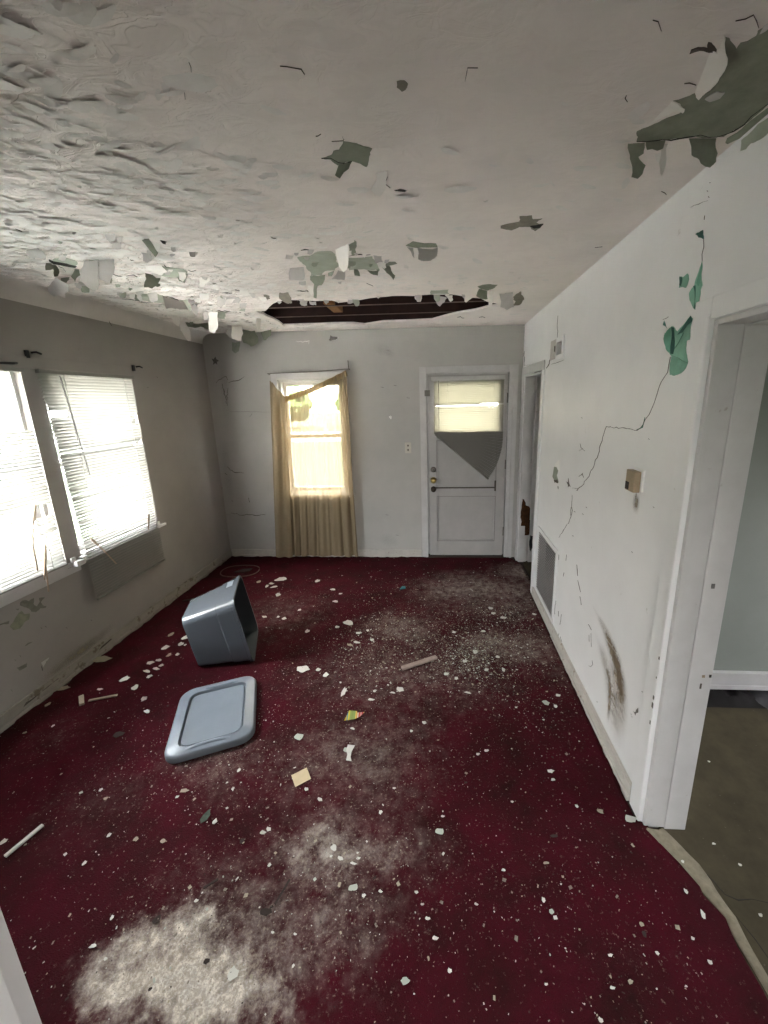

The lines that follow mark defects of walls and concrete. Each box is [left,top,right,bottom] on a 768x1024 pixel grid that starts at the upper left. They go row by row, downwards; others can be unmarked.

flaking render [41,0,117,28]
flaking render [0,17,555,353]
peeling [614,23,768,202]
peeling [663,262,703,376]
crack [560,357,671,535]
damp [606,634,624,710]